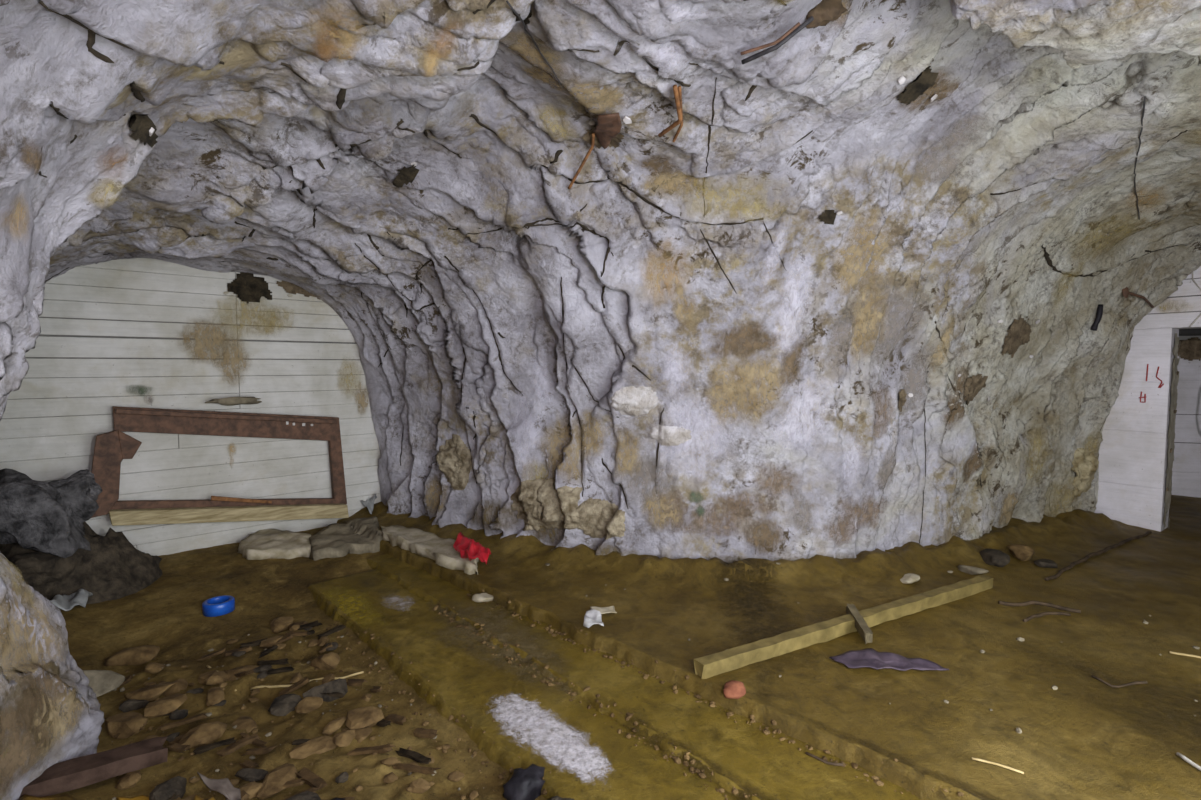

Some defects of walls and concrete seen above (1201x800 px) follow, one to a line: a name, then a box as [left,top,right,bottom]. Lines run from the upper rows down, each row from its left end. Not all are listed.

crack [50,101,78,144]
crack [37,0,145,116]
crack [281,62,347,110]
crack [262,119,462,228]
crack [355,0,787,396]
damp [183,301,281,382]
spalling [224,272,321,306]
crack [460,346,477,484]
crack [560,277,628,509]
crack [655,408,664,494]
crack [919,321,957,544]
crack [1041,245,1201,277]